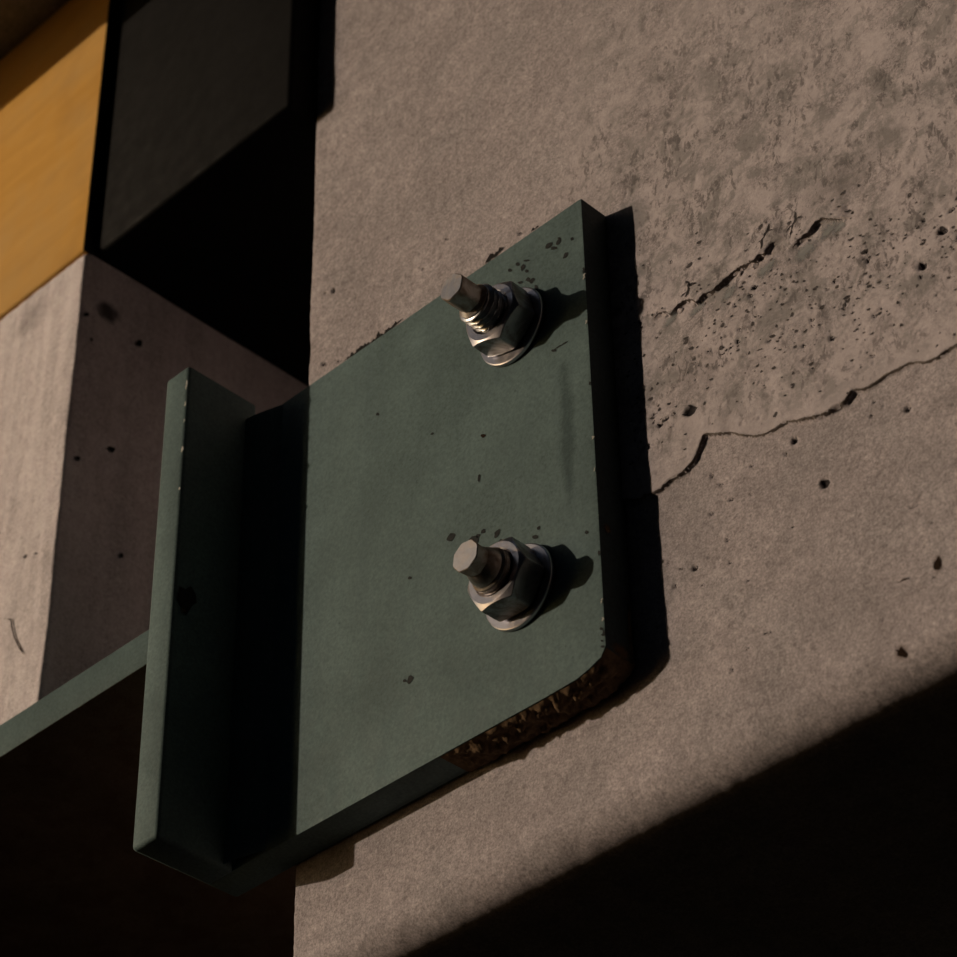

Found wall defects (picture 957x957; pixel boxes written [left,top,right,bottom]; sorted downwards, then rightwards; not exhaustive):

crack [759,213,801,249]
spalling [654,242,775,326]
spalling [626,344,957,502]